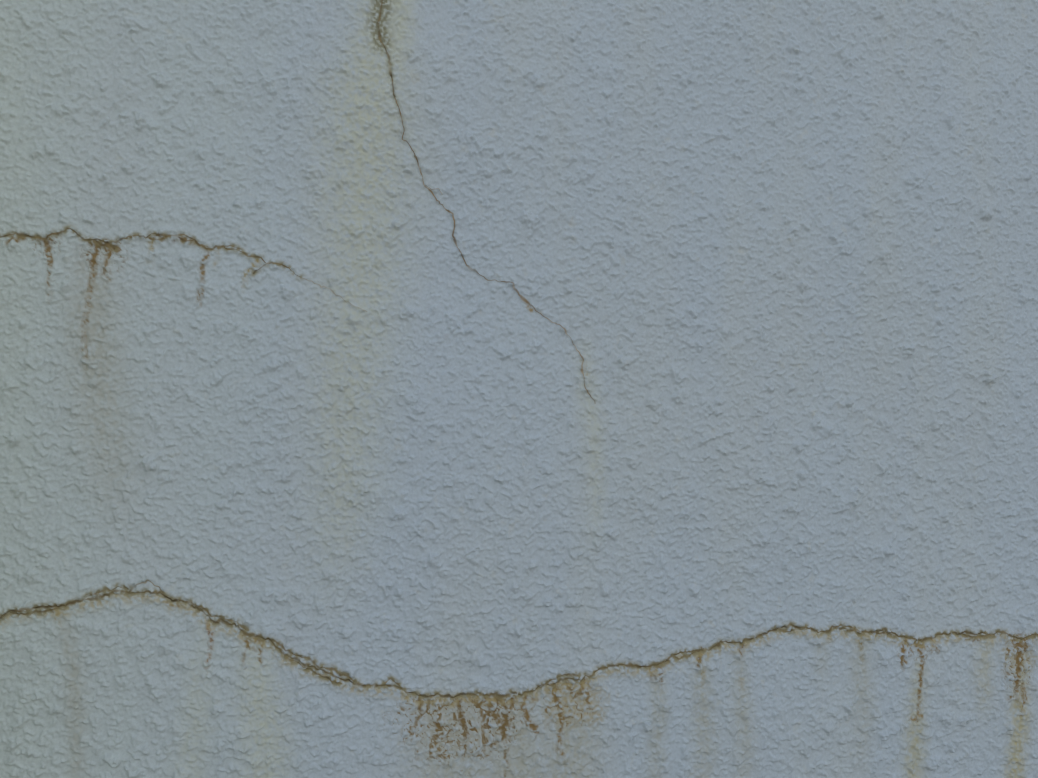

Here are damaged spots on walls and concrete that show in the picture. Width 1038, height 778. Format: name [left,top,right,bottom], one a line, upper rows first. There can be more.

crack [361,0,596,404]
crack [0,222,368,312]
corrosion [367,678,612,778]
crack [0,579,1038,710]
corrosion [892,634,942,724]
corrosion [995,625,1038,718]